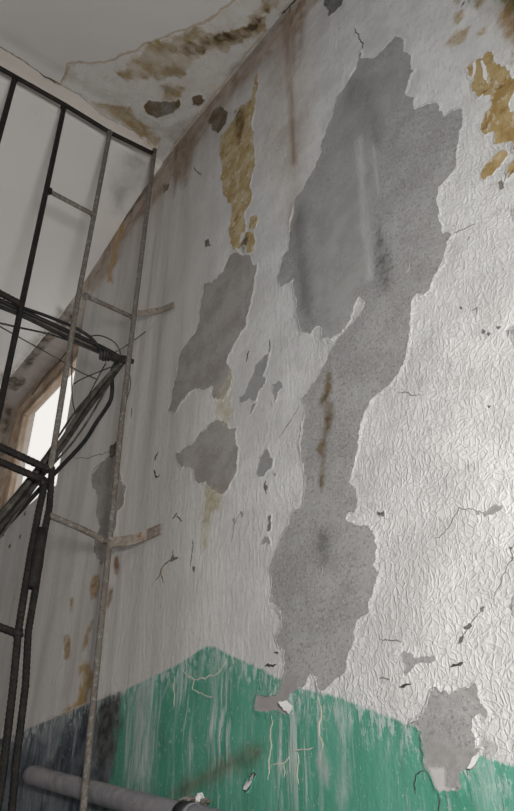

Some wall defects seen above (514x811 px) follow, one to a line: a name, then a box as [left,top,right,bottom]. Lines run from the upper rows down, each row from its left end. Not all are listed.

spalling [323,0,344,17]
leakage [502,0,514,32]
spalling [143,99,181,118]
leakage [60,0,276,152]
peeling [168,70,260,415]
peeling [239,351,284,417]
corrosion [321,374,332,431]
peeling [252,33,466,719]
peeling [506,325,514,357]
peeling [175,417,240,498]
peeling [91,455,127,568]
peeling [407,680,492,800]